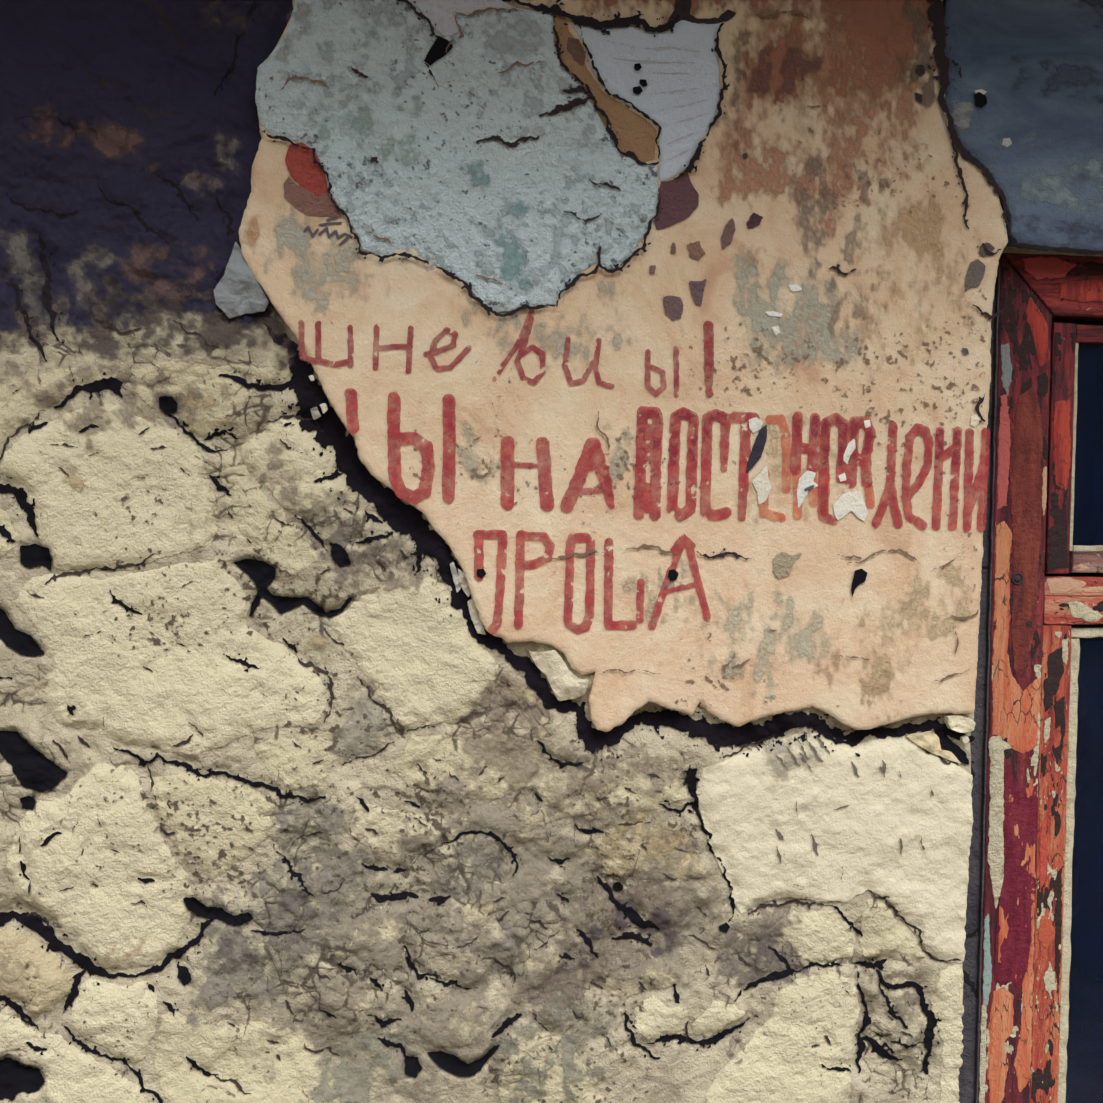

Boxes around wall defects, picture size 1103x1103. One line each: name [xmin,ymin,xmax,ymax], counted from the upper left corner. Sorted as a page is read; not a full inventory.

water stain [732,32,823,107]
peeling [255,0,736,313]
crack [926,0,1011,256]
peeling [214,242,269,319]
crack [973,304,1008,321]
peeling [746,417,772,505]
peeling [450,562,486,635]
crack [0,175,988,1103]
peeling [528,649,588,701]
peeling [979,256,1103,1103]
peeling [906,731,961,764]
peeling [944,714,975,743]